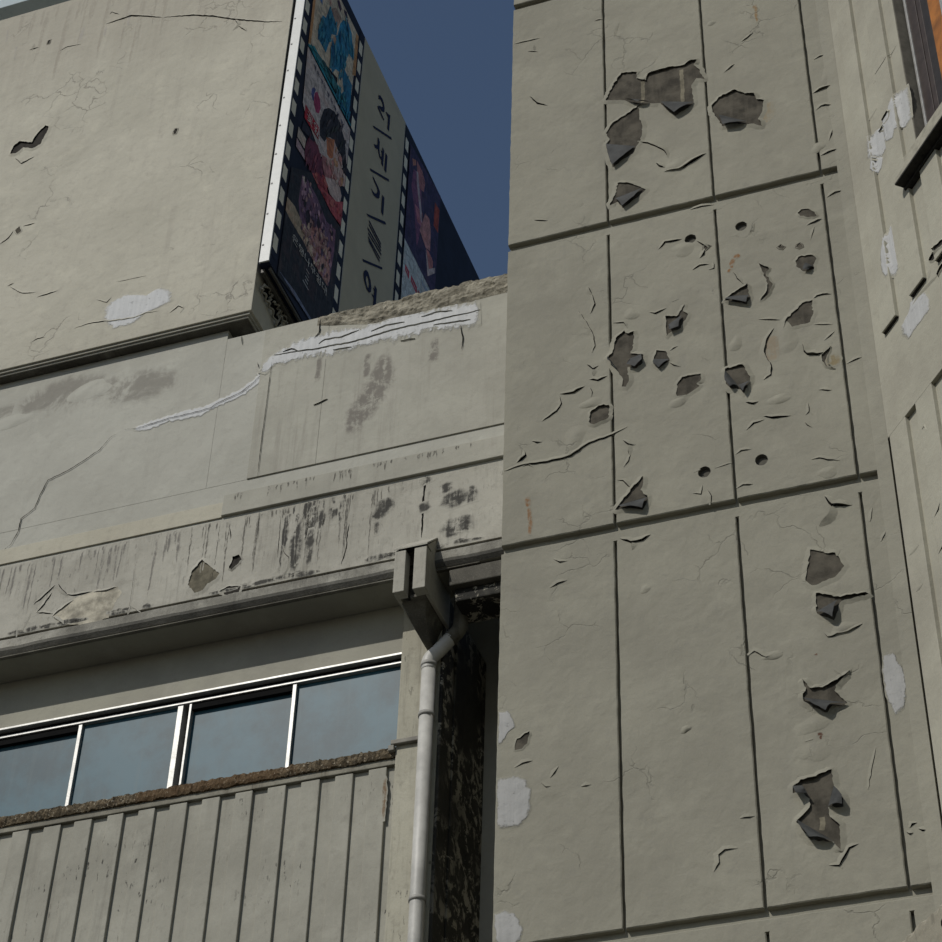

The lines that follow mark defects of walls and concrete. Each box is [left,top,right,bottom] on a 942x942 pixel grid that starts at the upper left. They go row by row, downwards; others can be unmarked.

crack [106,11,280,31]
peeling [7,124,52,157]
peeling [602,58,768,212]
spalling [317,274,508,326]
leakage [133,300,482,439]
peeling [603,302,692,391]
leakage [363,486,415,563]
leakage [415,476,484,549]
peeling [184,554,244,596]
peeling [800,546,874,625]
leakage [6,617,89,636]
peeling [787,766,850,853]